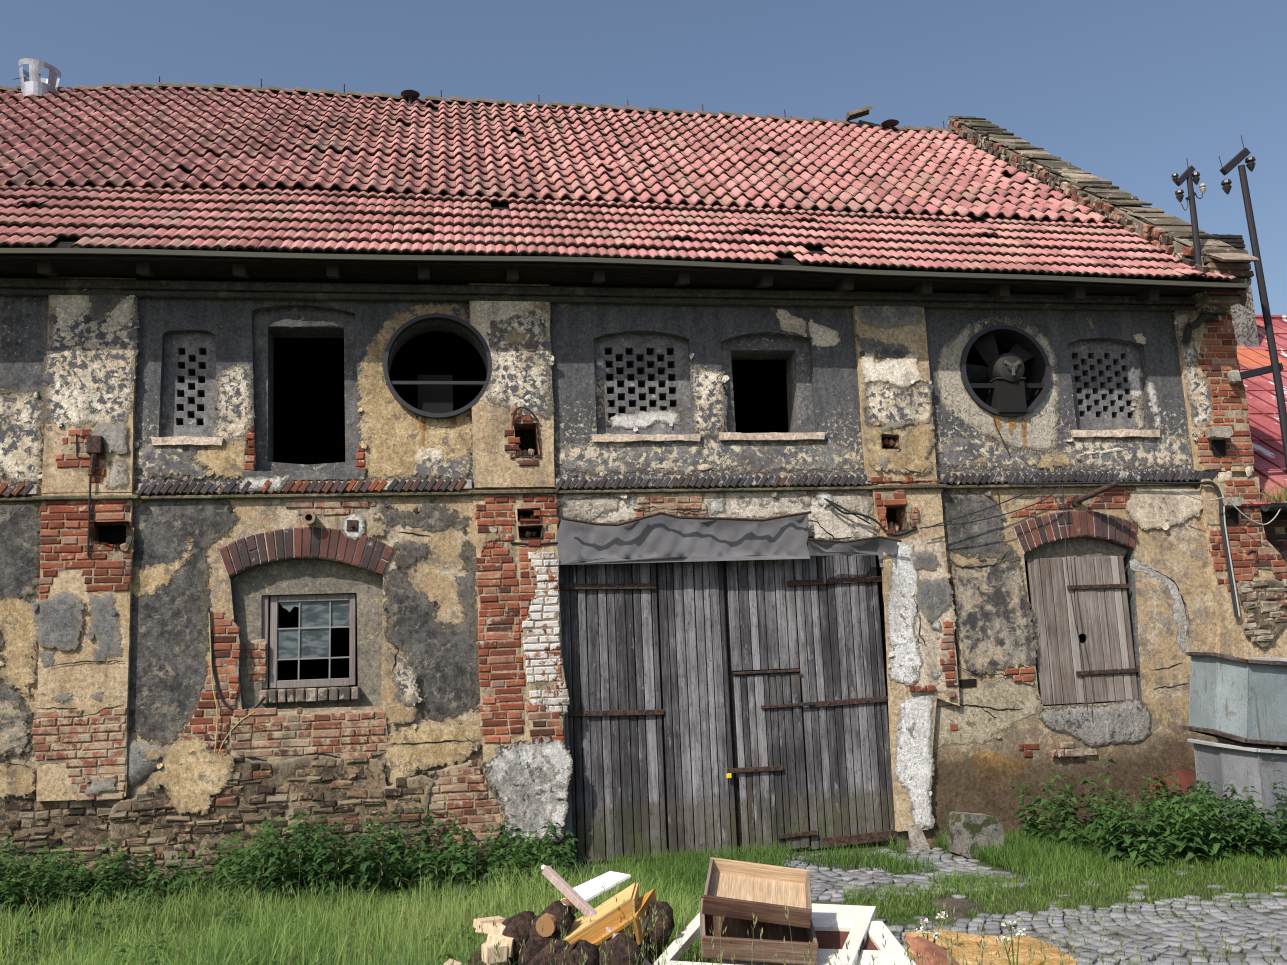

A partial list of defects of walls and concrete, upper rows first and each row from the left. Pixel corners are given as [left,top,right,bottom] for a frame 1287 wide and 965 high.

rust [994,417,1026,447]
flaking render [0,283,1287,896]
crack [914,550,1031,718]
crack [1130,559,1190,689]